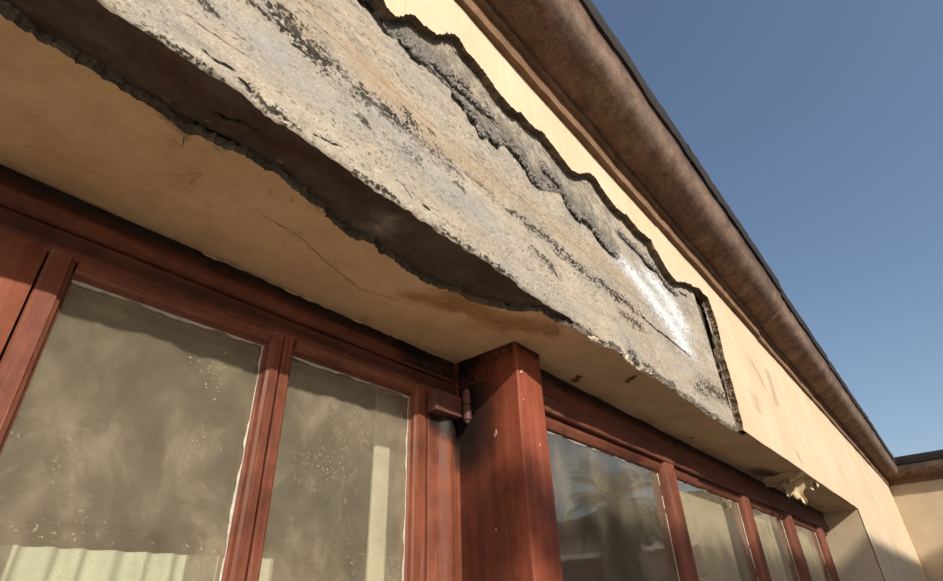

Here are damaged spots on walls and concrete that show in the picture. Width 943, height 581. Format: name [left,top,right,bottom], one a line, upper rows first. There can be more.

spalling [0,0,744,435]
crack [358,0,715,345]
crack [638,307,691,357]